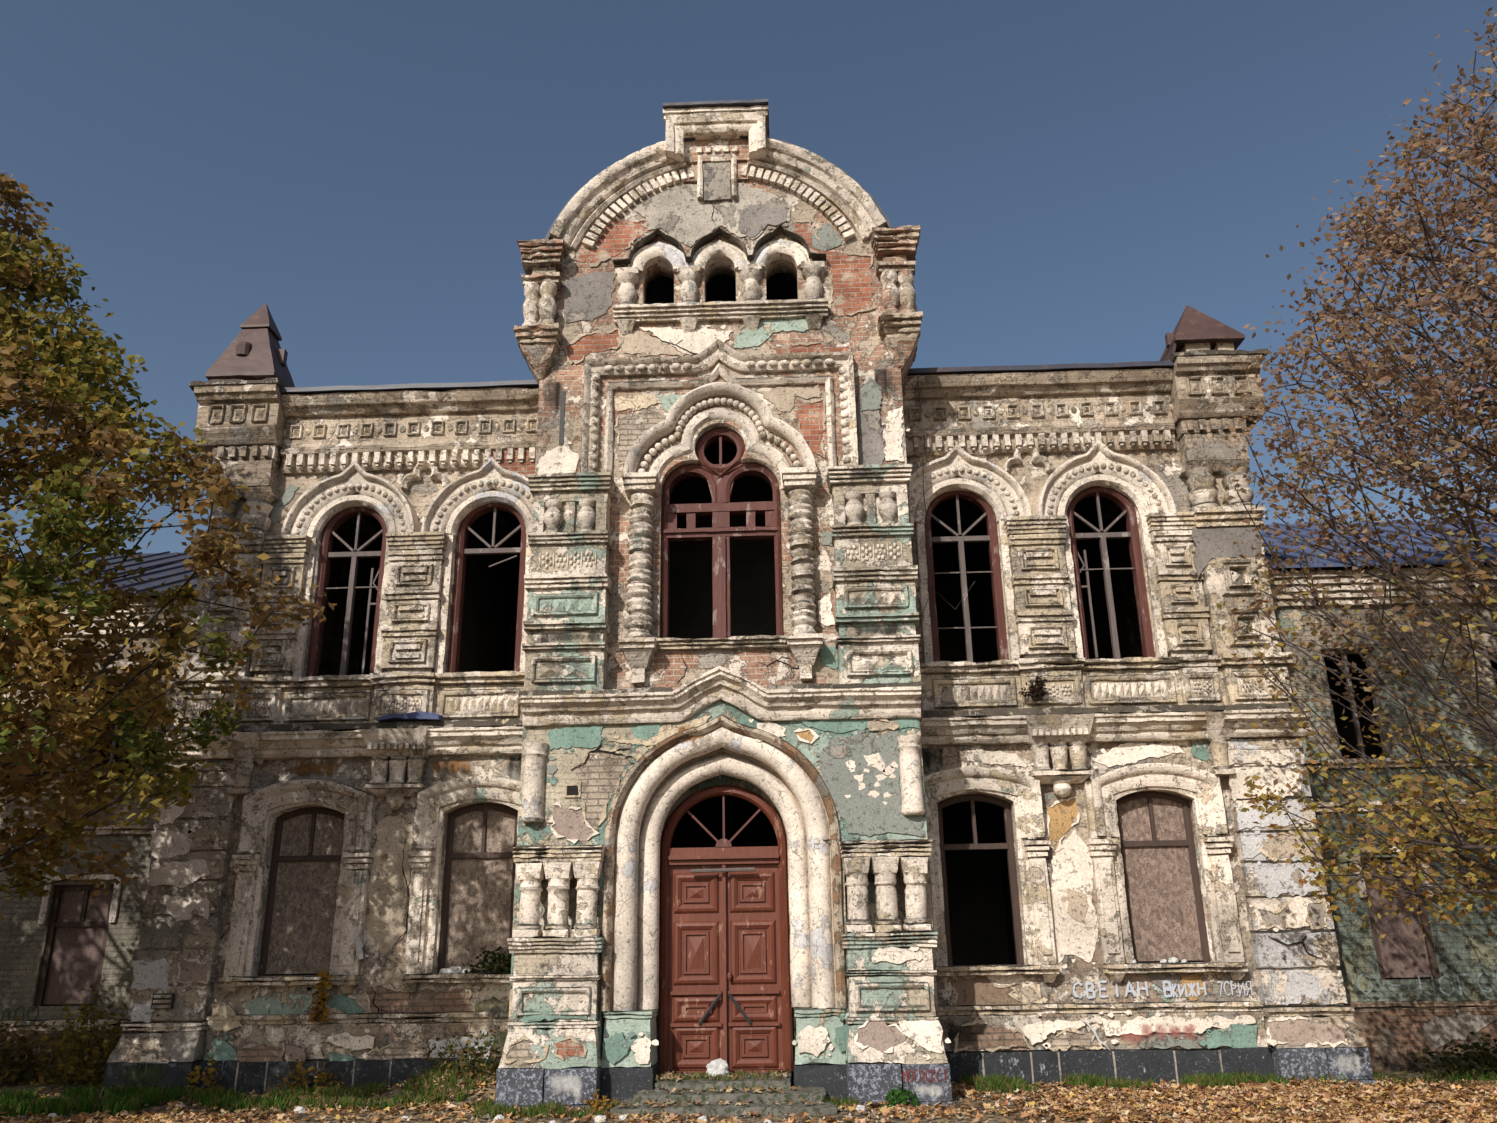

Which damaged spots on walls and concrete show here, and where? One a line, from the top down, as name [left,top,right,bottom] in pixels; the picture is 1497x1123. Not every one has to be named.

spalling [547,723,663,844]
peeling [794,718,920,763]
peeling [845,752,898,805]
peeling [149,798,215,925]
peeling [1045,797,1100,969]
peeling [126,958,179,1023]
peeling [140,1053,169,1070]
spalling [204,983,659,1064]
peeling [792,969,1348,1060]